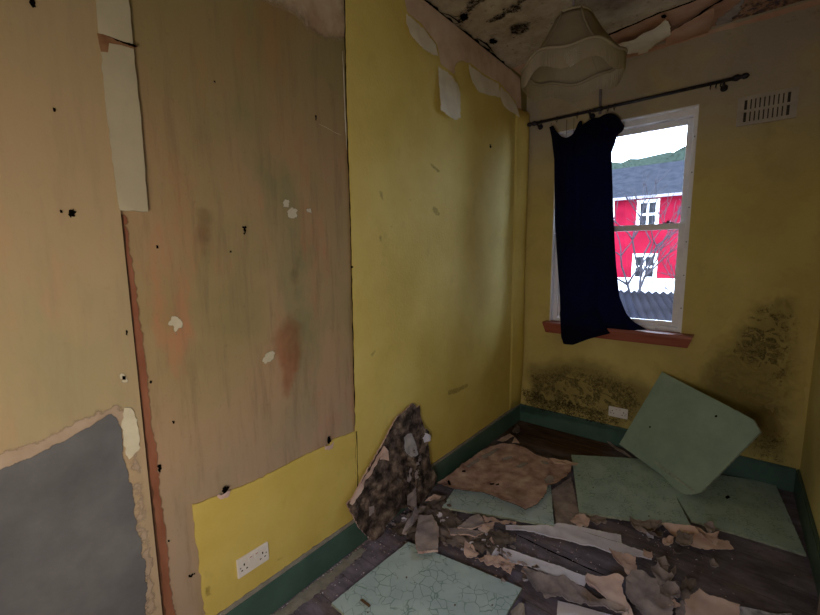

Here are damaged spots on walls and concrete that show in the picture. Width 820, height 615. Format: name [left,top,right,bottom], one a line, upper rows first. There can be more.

peeling [267,0,346,38]
mould [487,0,526,23]
mould [508,23,529,38]
peeling [405,0,522,120]
peeling [283,199,312,219]